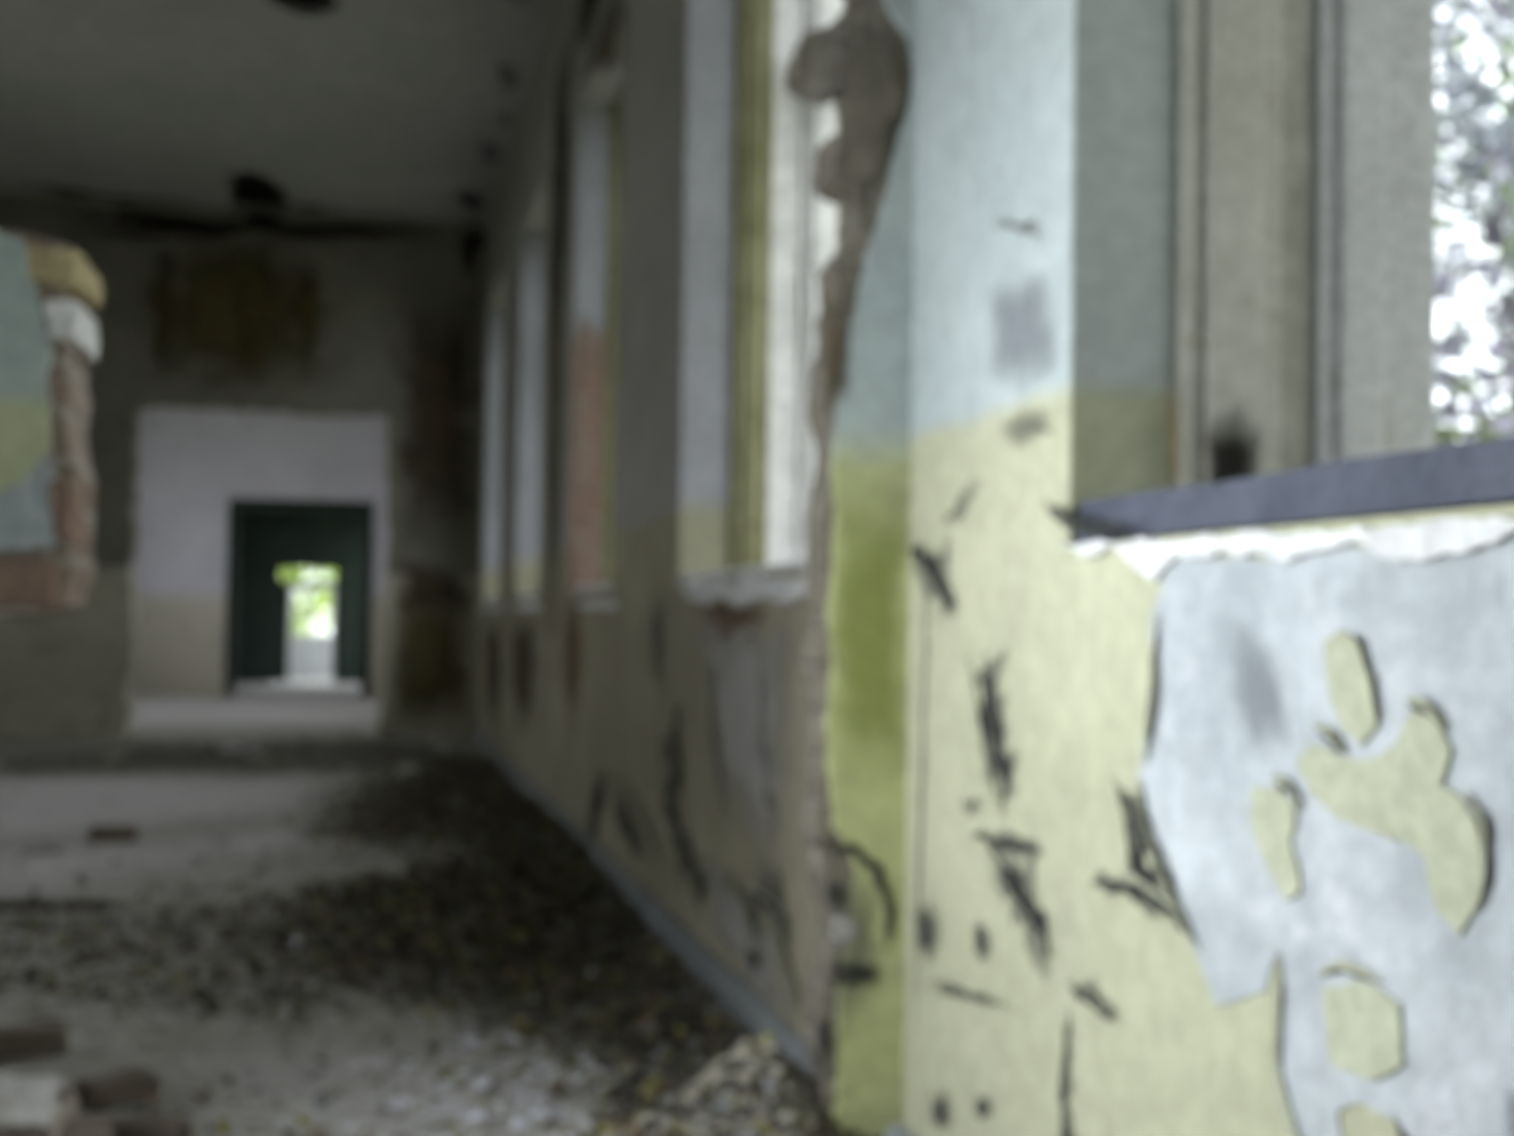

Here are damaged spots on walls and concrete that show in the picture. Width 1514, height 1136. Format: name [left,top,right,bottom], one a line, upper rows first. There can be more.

spalling [815,30,904,242]
flaking render [25,247,104,361]
spalling [675,575,808,826]
spalling [87,824,138,842]
peeling [1059,516,1514,1136]
spalling [827,881,876,984]
spalling [831,843,895,942]
spalling [920,917,934,949]
spalling [976,929,986,953]
flaking render [0,1121,53,1136]
spalling [0,1018,70,1097]
spalling [59,1066,194,1136]